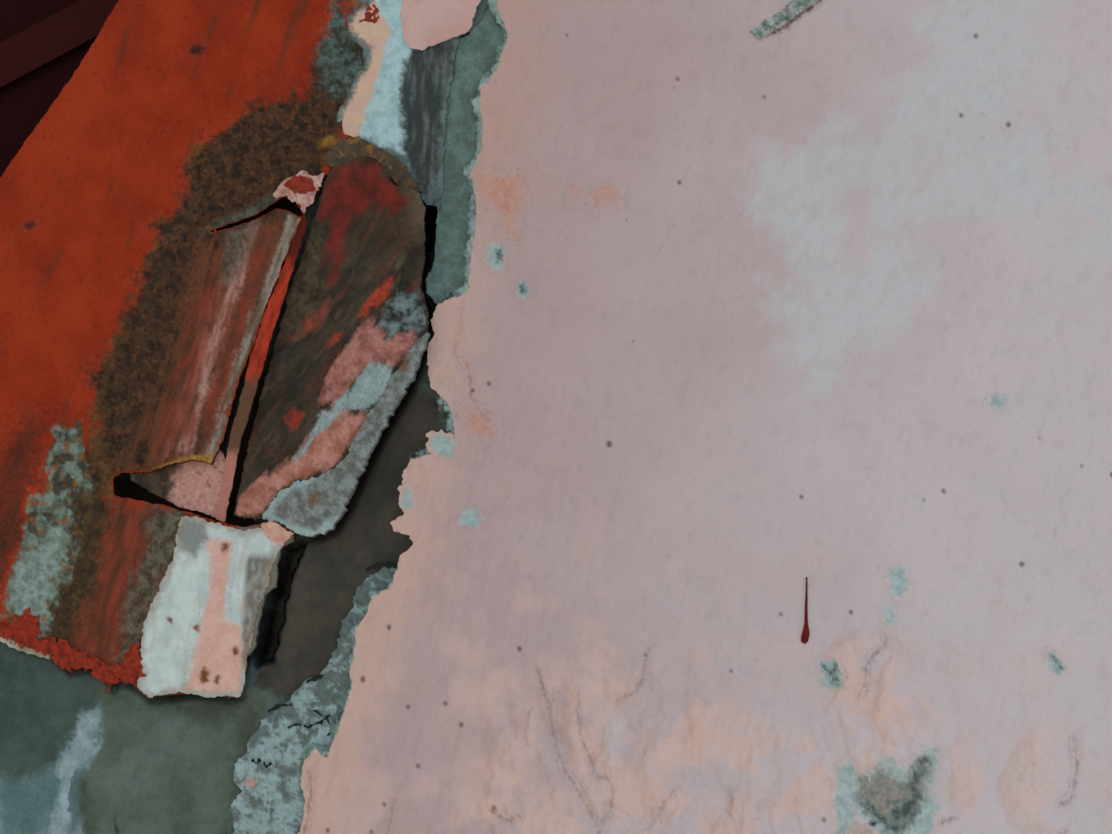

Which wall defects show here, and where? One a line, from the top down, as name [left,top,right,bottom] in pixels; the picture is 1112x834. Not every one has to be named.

corrosion [0,398,60,608]
corrosion [37,52,350,667]
corrosion [197,664,224,689]
leakage [0,374,449,834]
peeling [0,0,537,698]